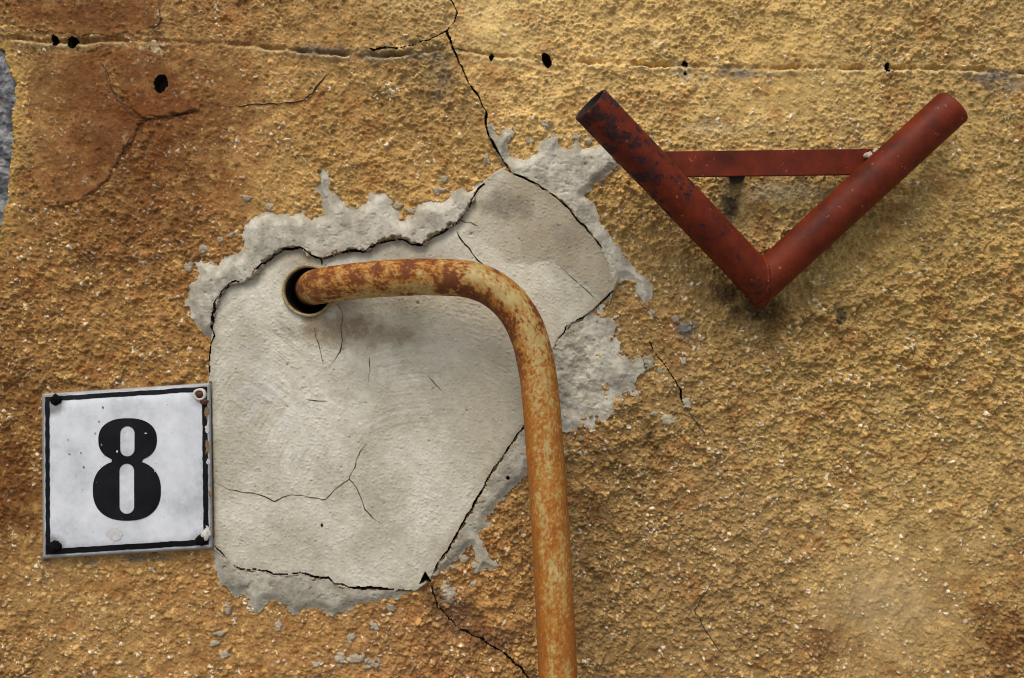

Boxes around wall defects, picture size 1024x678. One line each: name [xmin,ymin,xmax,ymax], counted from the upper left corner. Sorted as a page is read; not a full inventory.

crack [102,64,195,166]
crack [231,69,334,107]
crack [369,0,602,248]
peeling [184,123,653,435]
crack [556,267,705,436]
peeling [205,429,527,617]
crack [215,425,529,678]